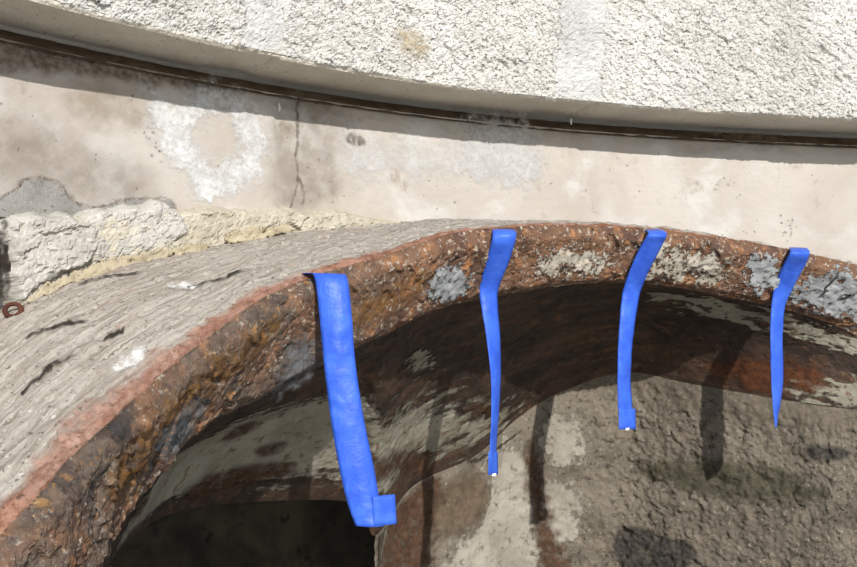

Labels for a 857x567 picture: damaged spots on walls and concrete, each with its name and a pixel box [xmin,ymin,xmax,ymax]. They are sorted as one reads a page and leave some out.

leakage [147,82,270,202]
spalling [0,177,176,218]
peeling [533,240,617,285]
peeling [645,236,783,333]
peeling [783,263,857,356]
corrosion [30,335,204,492]
corrosion [226,422,255,440]
corrosion [712,361,772,392]
peeling [782,373,857,409]
corrosion [189,443,294,500]
corrosion [371,450,427,482]
leakage [615,527,694,567]